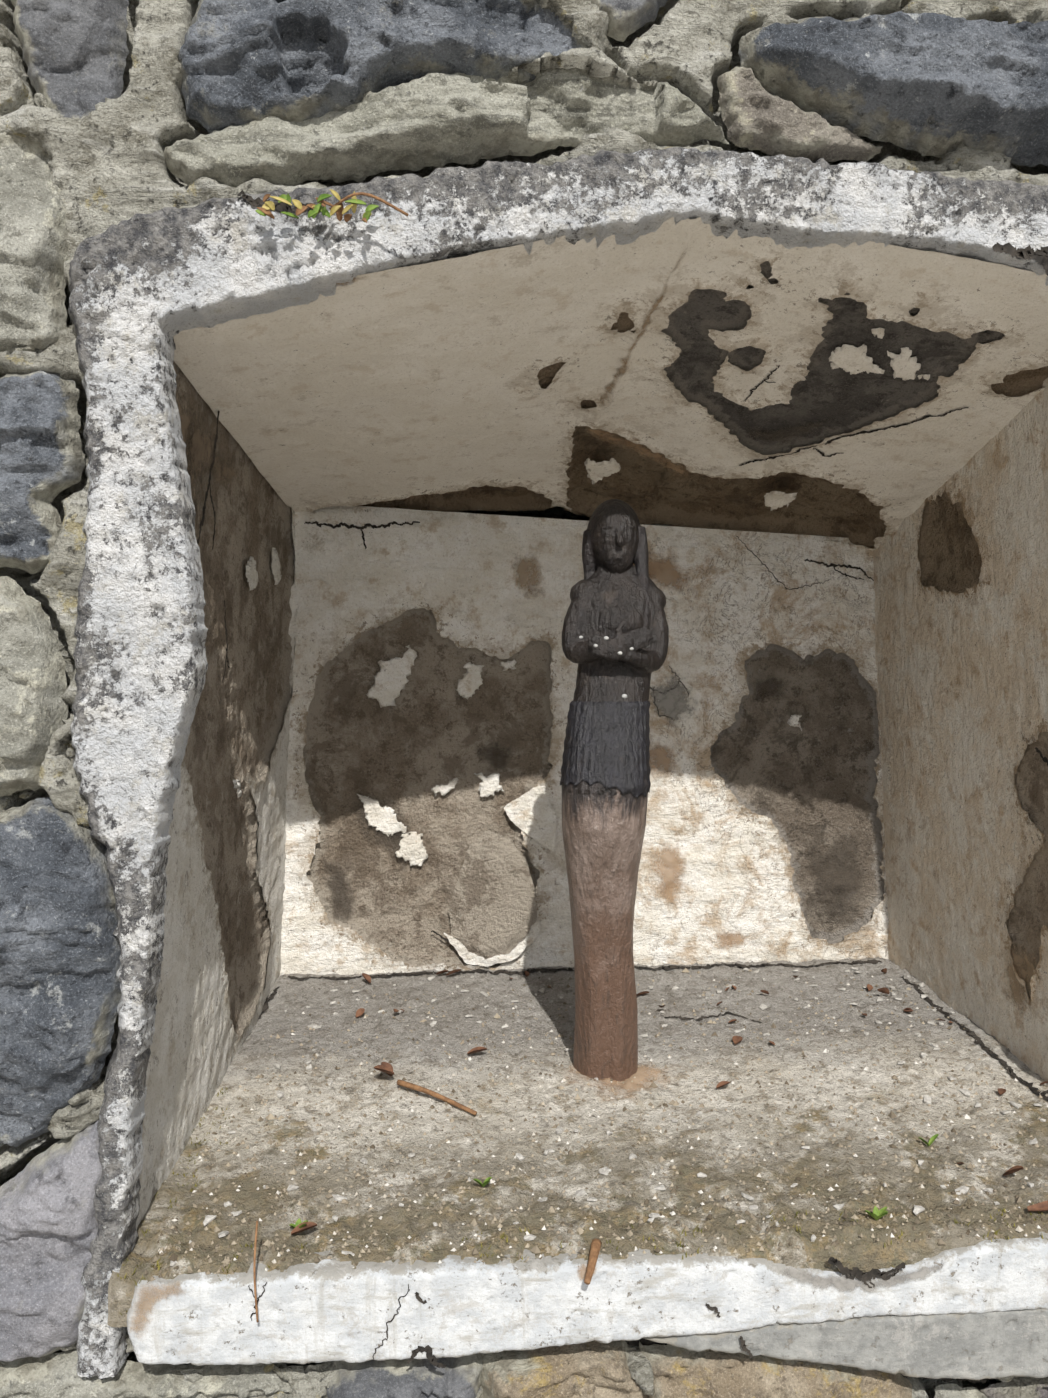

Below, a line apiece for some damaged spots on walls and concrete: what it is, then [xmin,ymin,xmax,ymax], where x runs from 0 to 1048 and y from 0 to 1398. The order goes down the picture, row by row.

peeling [661,261,1005,455]
crack [304,521,420,549]
spalling [357,426,887,549]
crack [736,536,874,590]
crack [739,407,969,466]
peeling [918,490,982,593]
peeling [173,361,294,1041]
peeling [302,608,557,968]
peeling [710,644,885,944]
peeling [1006,732,1048,1000]
crack [372,1284,447,1368]
crack [828,1257,906,1288]